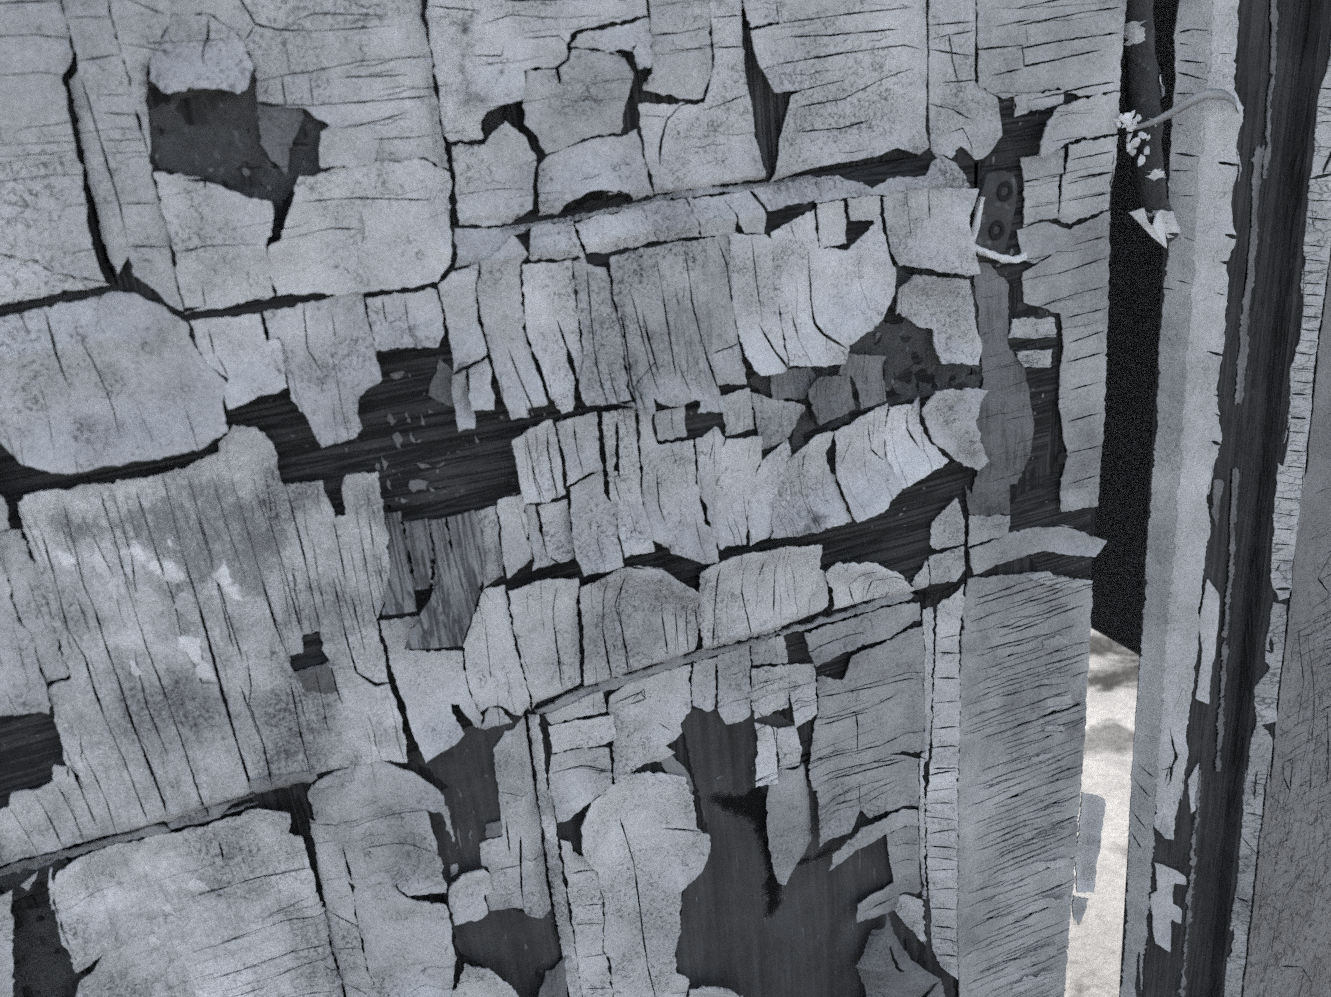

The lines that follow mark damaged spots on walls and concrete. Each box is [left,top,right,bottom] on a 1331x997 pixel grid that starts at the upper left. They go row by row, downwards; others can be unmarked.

peeling [147,14,380,207]
peeling [190,27,1120,768]
crack [982,237,1101,491]
crack [1216,234,1233,295]
peeling [1224,0,1331,997]
crack [282,819,358,989]
peeling [0,291,965,997]
crack [506,793,541,864]
crack [620,820,655,996]
crack [750,588,1072,860]
peeling [1023,792,1106,925]
peeling [1150,466,1240,997]